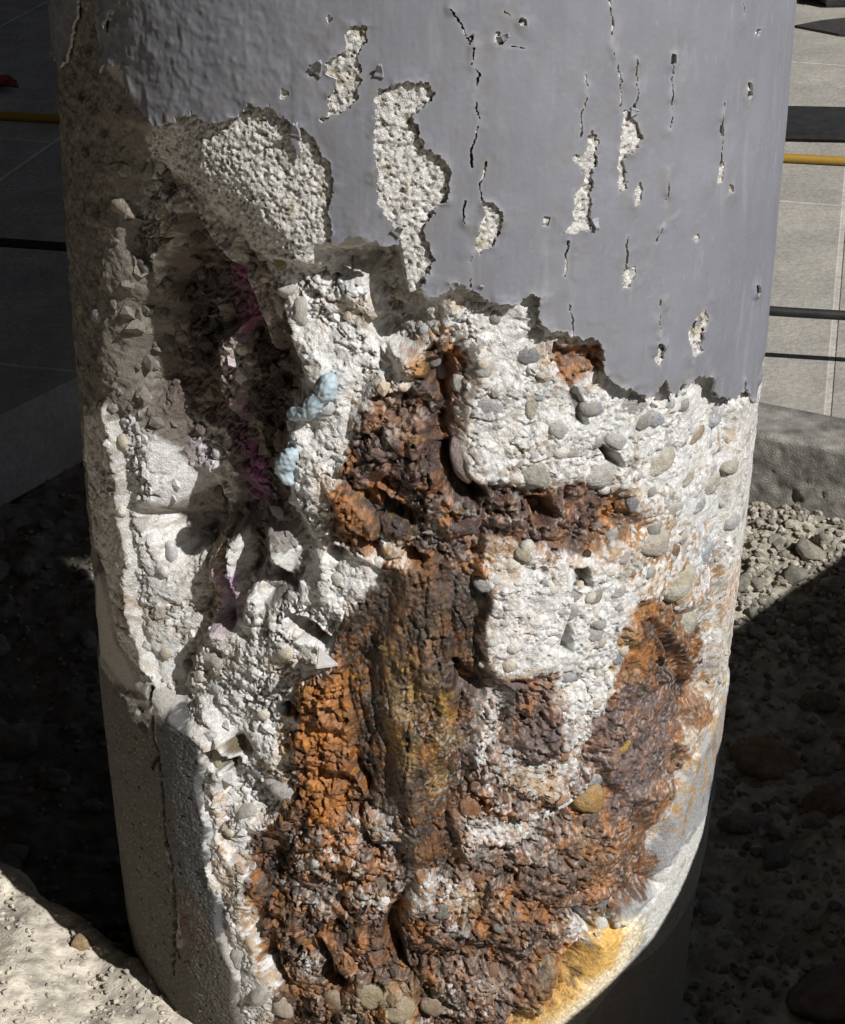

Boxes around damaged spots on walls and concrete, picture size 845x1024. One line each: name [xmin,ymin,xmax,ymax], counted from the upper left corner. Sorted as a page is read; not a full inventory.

crack [450,9,487,287]
crack [562,240,570,276]
corrosion [400,342,426,381]
corrosion [551,342,603,385]
corrosion [329,488,381,555]
spalling [90,25,764,1024]
corrosion [605,507,666,555]
corrosion [623,593,715,735]
crack [146,684,181,976]
corrosion [510,908,647,1024]